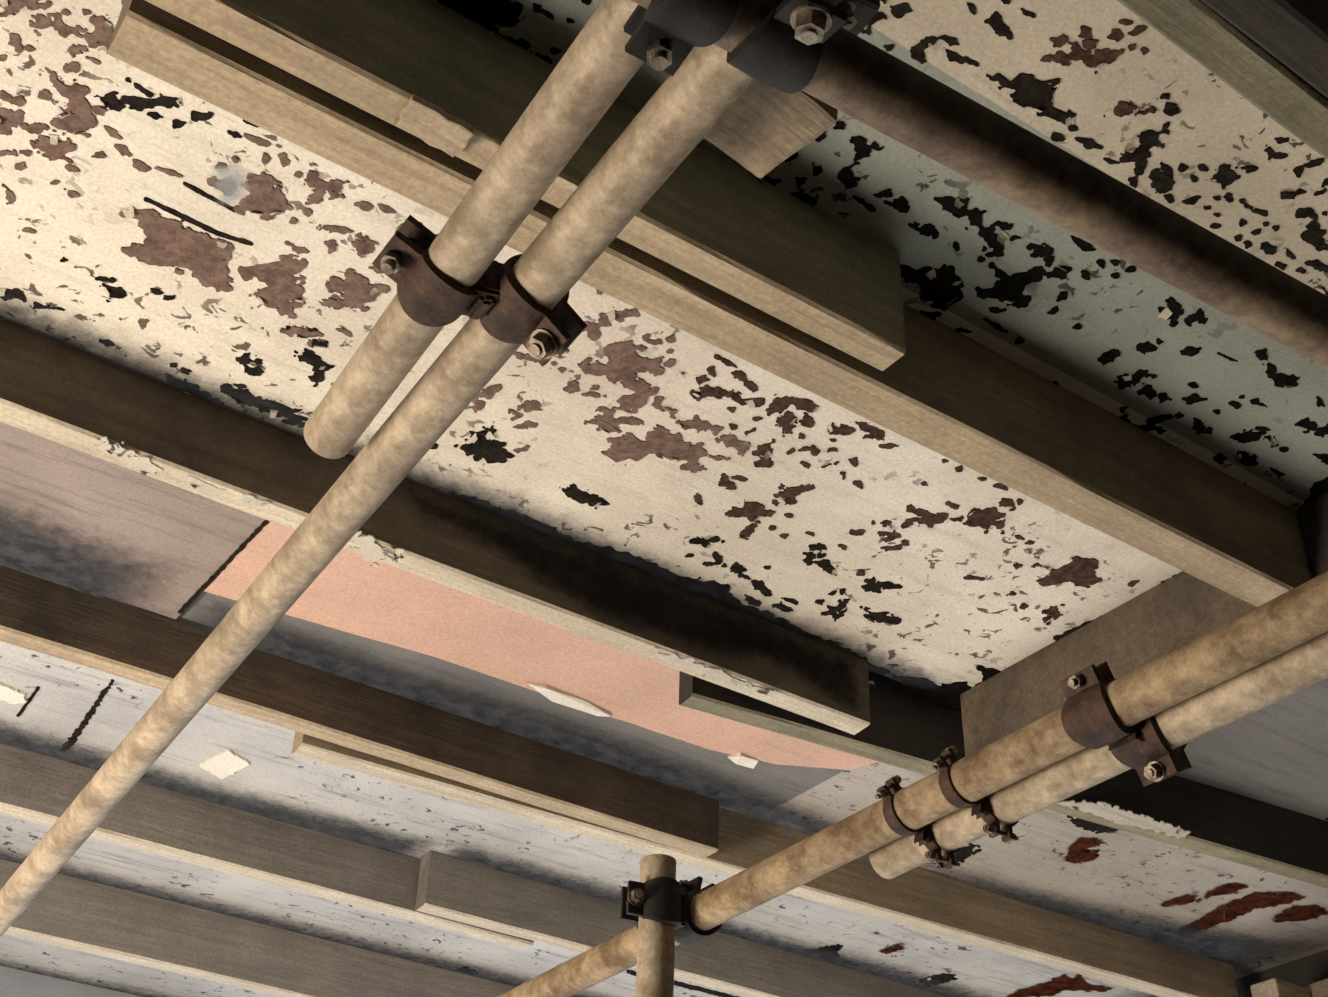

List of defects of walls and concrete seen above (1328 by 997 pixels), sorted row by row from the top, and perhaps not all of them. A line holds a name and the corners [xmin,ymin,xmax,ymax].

peeling [0,0,214,198]
peeling [119,206,352,387]
peeling [206,119,396,312]
peeling [760,121,1136,344]
peeling [910,19,1328,296]
peeling [430,384,529,464]
peeling [508,307,899,653]
peeling [802,476,1035,625]
crack [62,679,114,749]
rust [1007,974,1113,997]
rust [1064,838,1103,864]
rust [1160,883,1328,934]